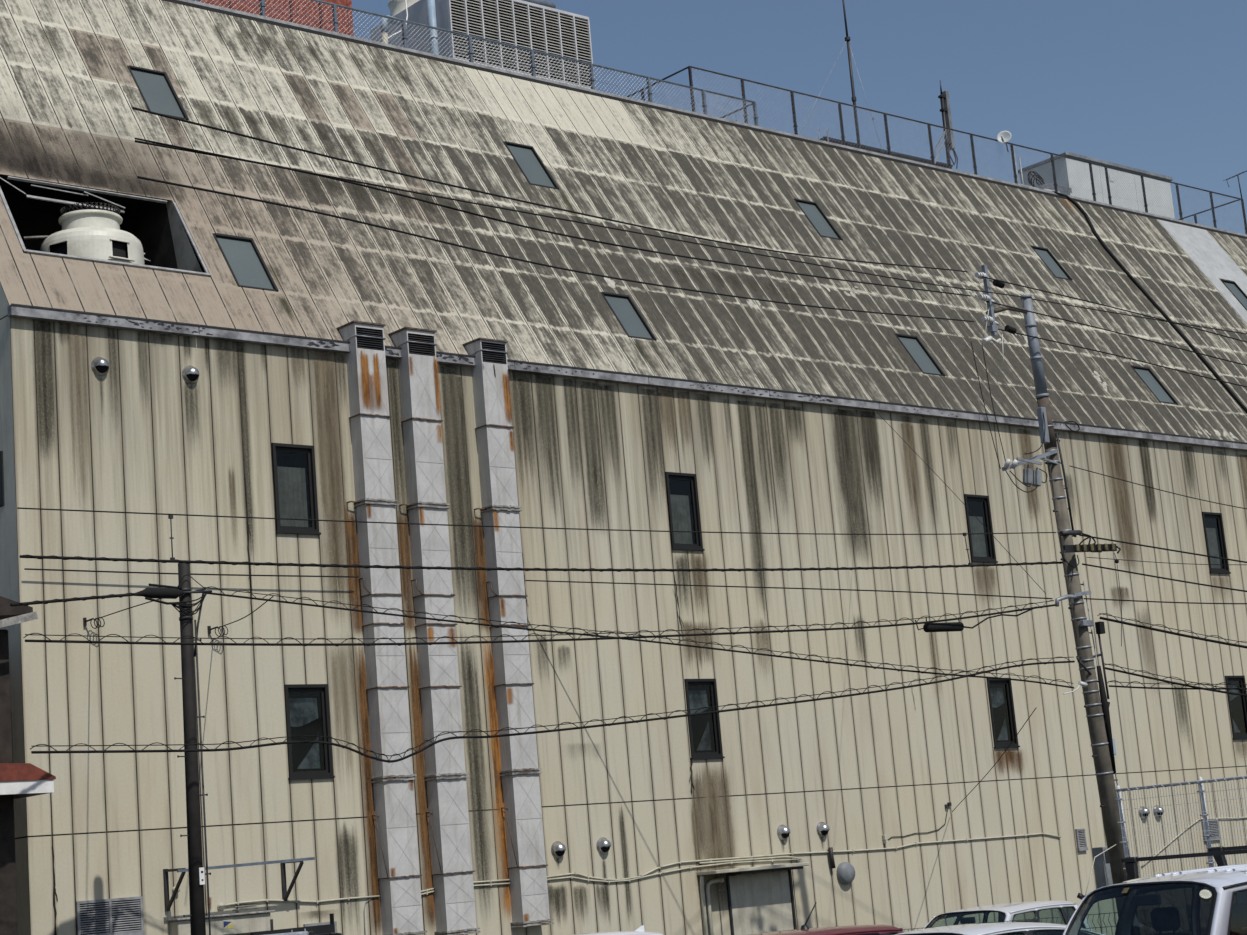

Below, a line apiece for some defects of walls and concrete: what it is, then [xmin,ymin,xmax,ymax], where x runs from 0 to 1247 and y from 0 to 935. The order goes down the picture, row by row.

leakage [0,136,155,195]
leakage [231,342,252,540]
corrosion [346,504,371,631]
corrosion [400,507,433,641]
corrosion [474,511,505,627]
leakage [512,371,618,516]
leakage [738,401,800,594]
leakage [1107,436,1134,563]
leakage [1139,440,1155,515]
corrosion [356,654,397,934]
corrosion [410,649,436,923]
corrosion [485,649,528,921]